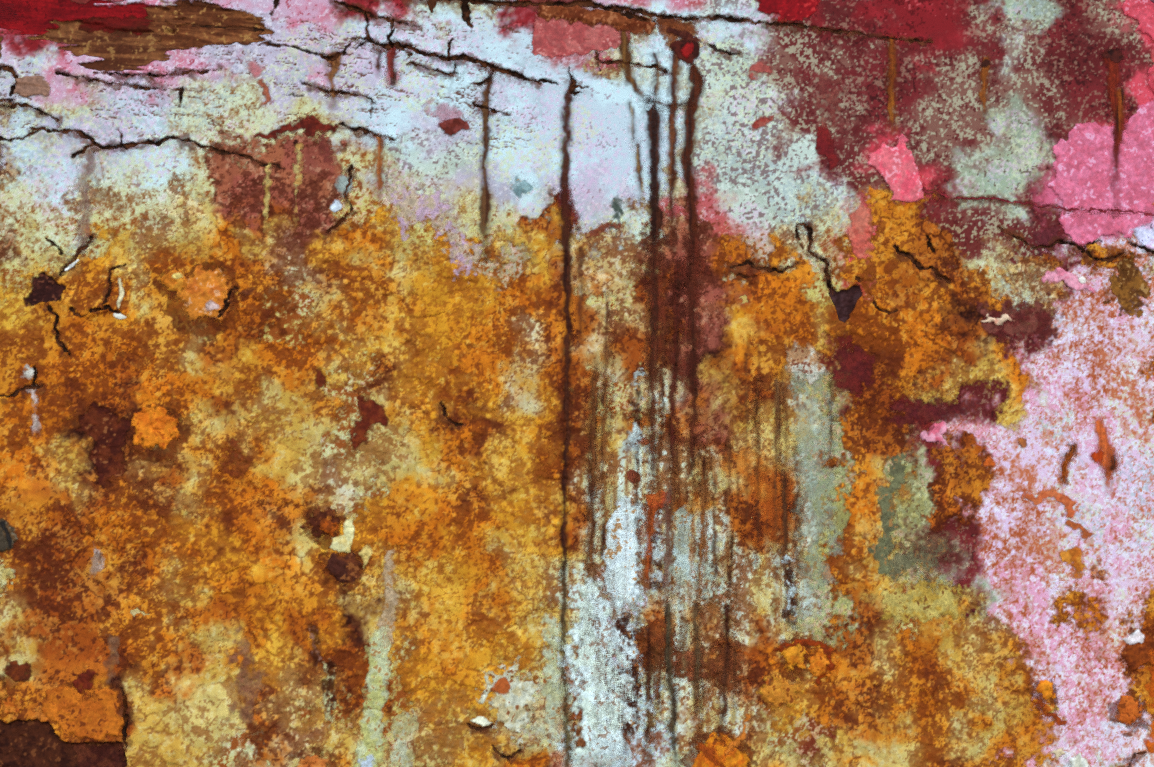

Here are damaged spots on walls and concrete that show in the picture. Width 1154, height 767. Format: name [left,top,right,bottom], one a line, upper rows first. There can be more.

peeling [0,0,275,71]
crack [0,63,284,169]
crack [258,0,932,232]
peeling [867,134,924,202]
crack [729,222,898,314]
peeling [848,207,874,259]
crack [893,235,951,286]
rust [922,430,996,535]
rust [1091,419,1118,483]
rust [1022,443,1154,753]
spalling [0,719,127,767]
rust [980,695,1057,767]